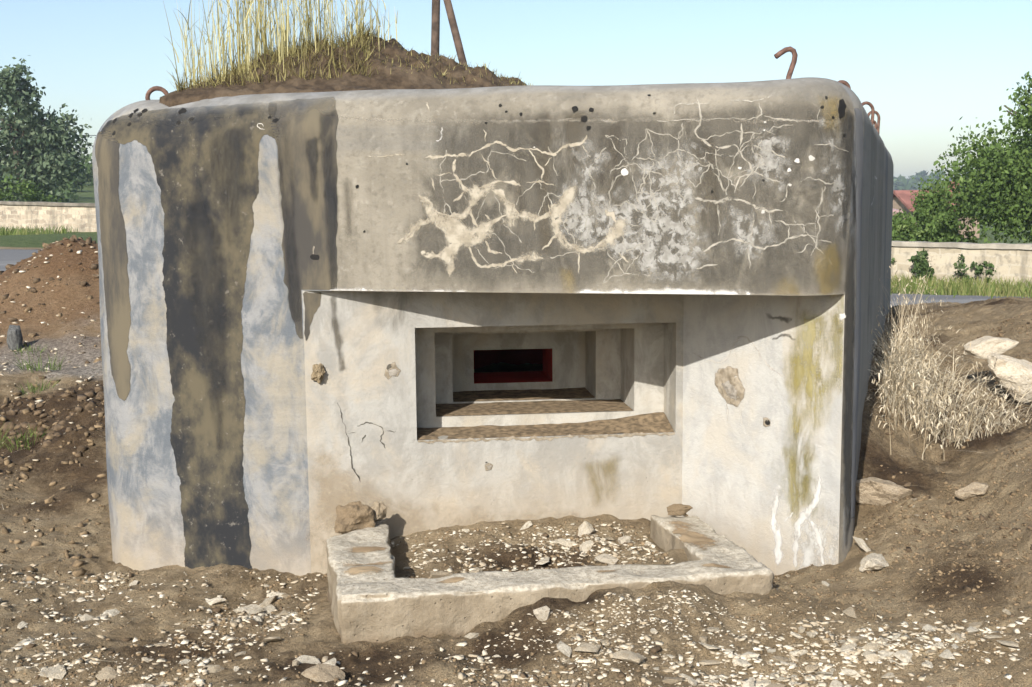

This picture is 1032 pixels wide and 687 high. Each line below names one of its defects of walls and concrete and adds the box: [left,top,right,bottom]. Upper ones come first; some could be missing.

crack [369,95,849,283]
damp [95,100,373,569]
crack [337,403,396,480]
damp [418,107,856,567]
spalling [715,366,745,424]